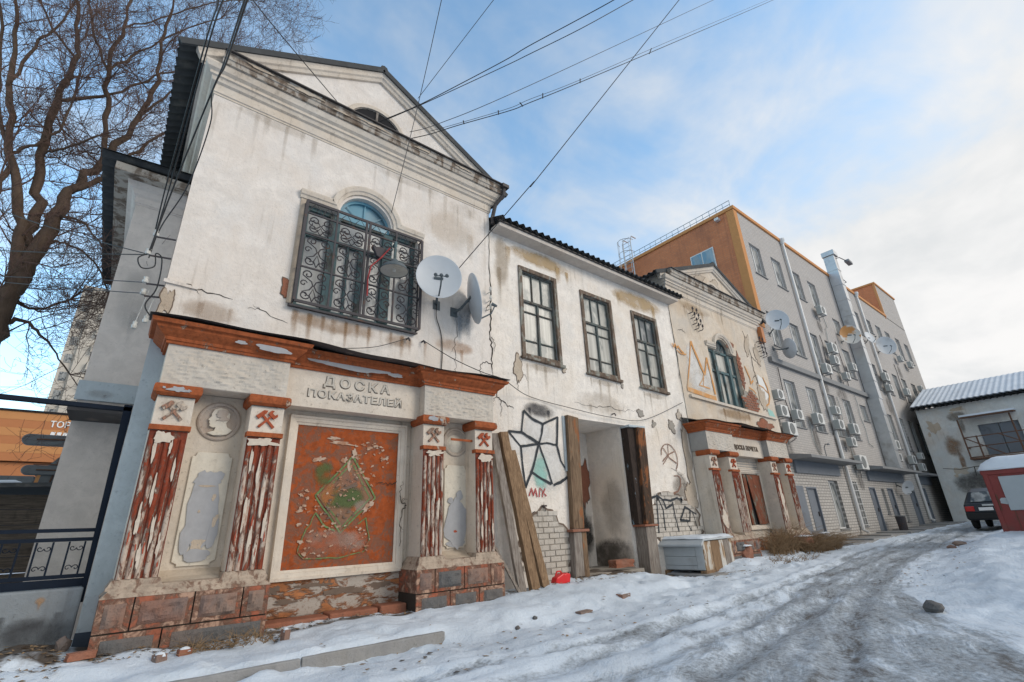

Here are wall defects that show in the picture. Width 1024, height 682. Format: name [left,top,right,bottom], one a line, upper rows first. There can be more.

flaking render [156,287,175,313]
crack [188,284,287,323]
peeling [235,340,292,355]
crack [454,250,528,412]
flaking render [513,352,523,383]
peeling [126,430,176,569]
peeling [234,438,280,564]
peeling [296,436,389,559]
peeling [426,450,466,550]
peeling [481,482,494,539]
flaking render [532,505,571,583]
flaking render [636,409,704,541]